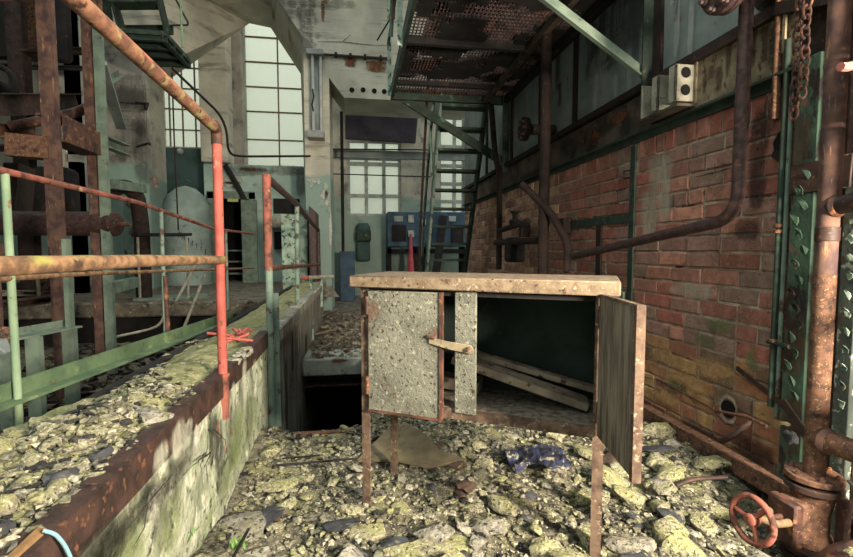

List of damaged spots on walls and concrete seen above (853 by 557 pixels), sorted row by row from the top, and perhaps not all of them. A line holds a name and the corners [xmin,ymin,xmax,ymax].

peeling [784,169,811,402]
damp [79,448,192,557]